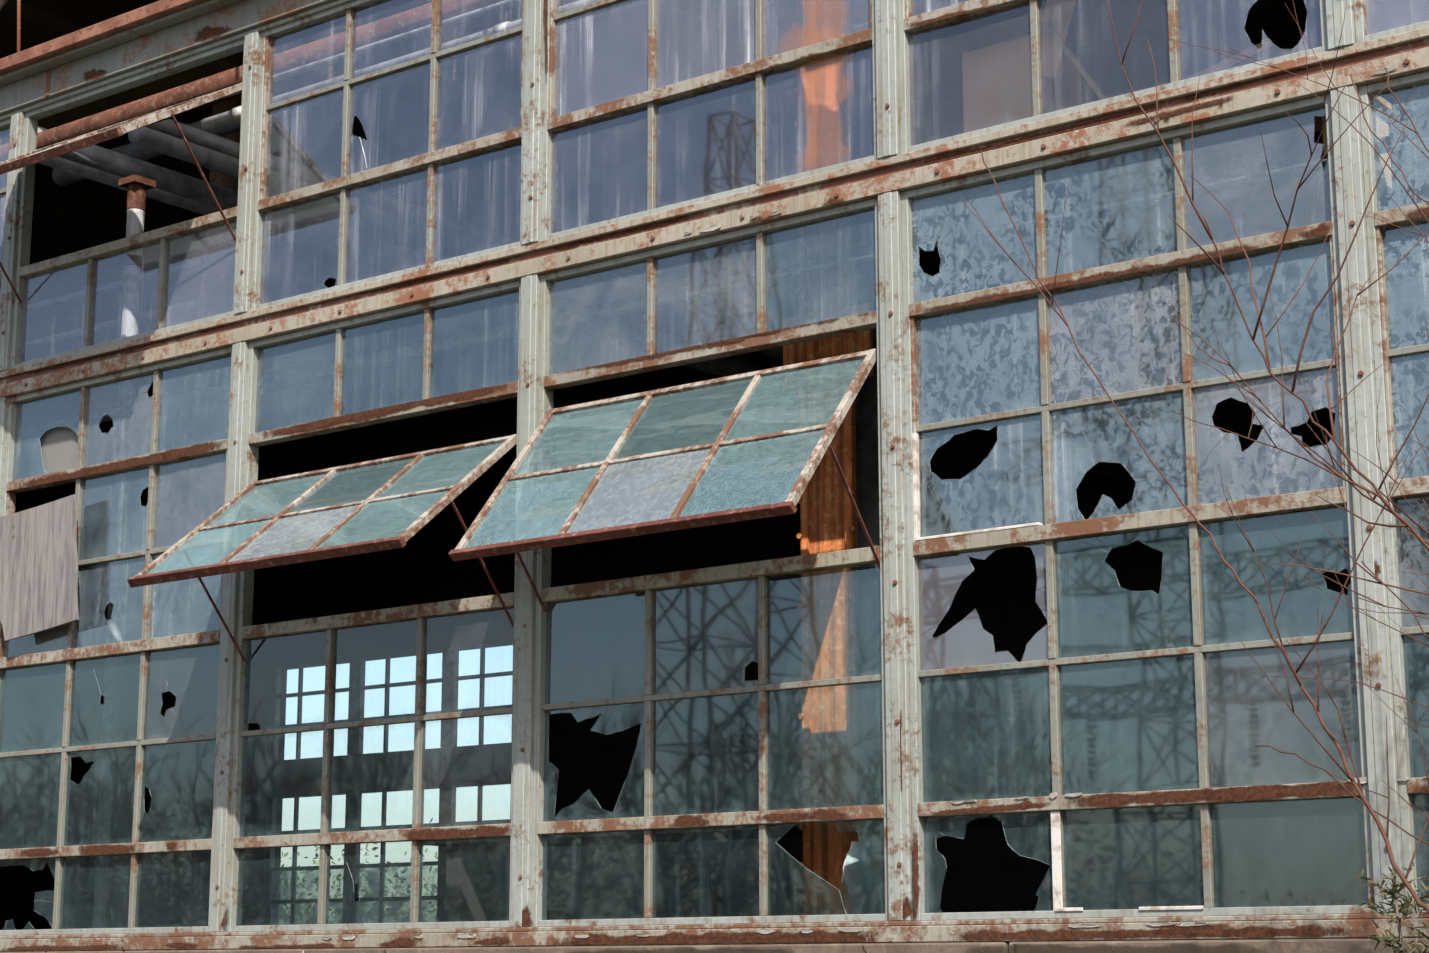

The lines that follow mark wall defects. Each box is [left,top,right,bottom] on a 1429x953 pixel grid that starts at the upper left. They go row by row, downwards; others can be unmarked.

corrosion [195,26,228,41]
corrosion [84,68,106,82]
corrosion [919,65,1315,167]
corrosion [554,216,688,251]
corrosion [1068,781,1355,807]
corrosion [522,906,533,927]
corrosion [380,938,414,947]
corrosion [475,936,509,945]
corrosion [961,924,1346,941]